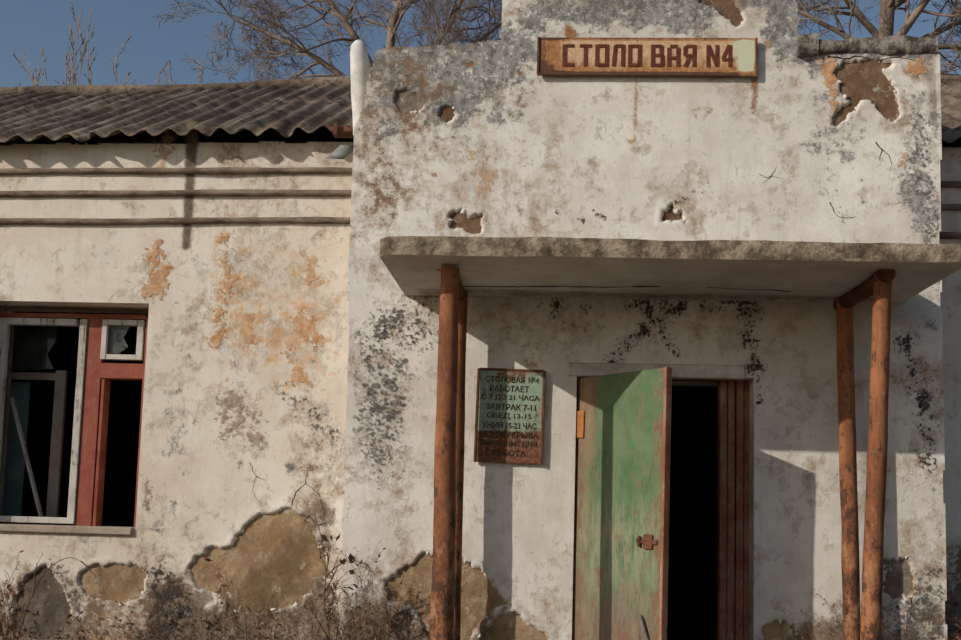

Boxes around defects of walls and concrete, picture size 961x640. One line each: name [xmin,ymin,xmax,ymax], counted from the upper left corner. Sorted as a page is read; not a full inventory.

flaking render [699,0,744,27]
flaking render [818,57,931,126]
flaking render [449,209,483,234]
flaking render [662,205,683,222]
leakage [273,382,341,444]
leakage [352,292,440,489]
leakage [464,290,836,415]
mould [894,330,938,476]
flaking render [13,564,147,640]
flaking render [189,508,330,640]
flaking render [386,550,433,636]
flaking render [460,559,547,640]